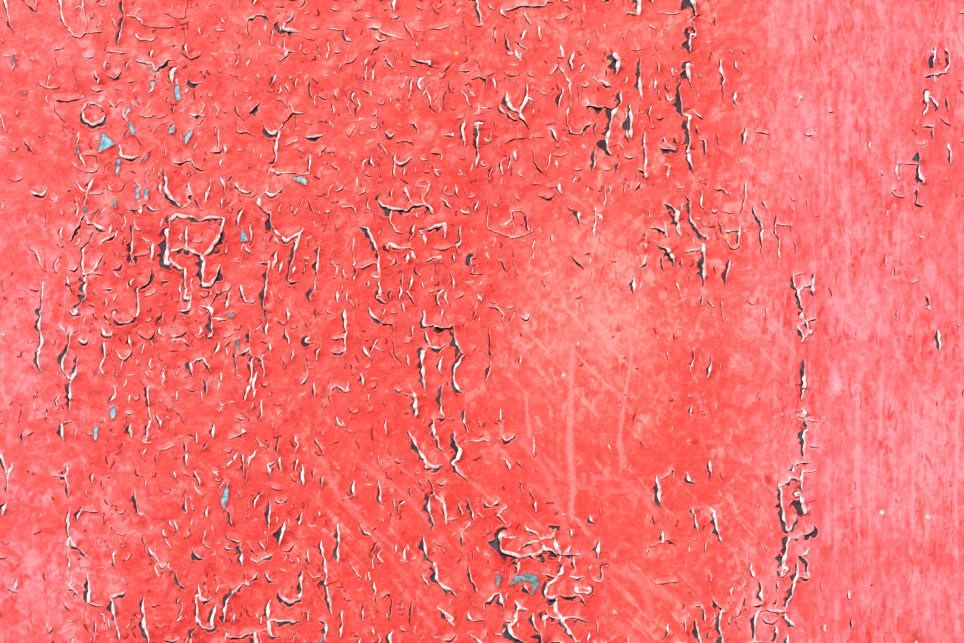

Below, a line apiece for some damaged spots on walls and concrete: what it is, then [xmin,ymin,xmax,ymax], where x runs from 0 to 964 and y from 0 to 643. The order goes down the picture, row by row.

peeling [0,129,44,156]
crack [0,0,239,145]
crack [158,57,286,209]
peeling [909,45,957,186]
crack [0,200,63,373]
crack [302,0,660,455]
peeling [787,267,832,345]
crack [49,343,539,643]
peeling [414,484,631,643]
crack [584,508,609,560]
crack [640,460,729,582]
peeling [662,416,821,643]